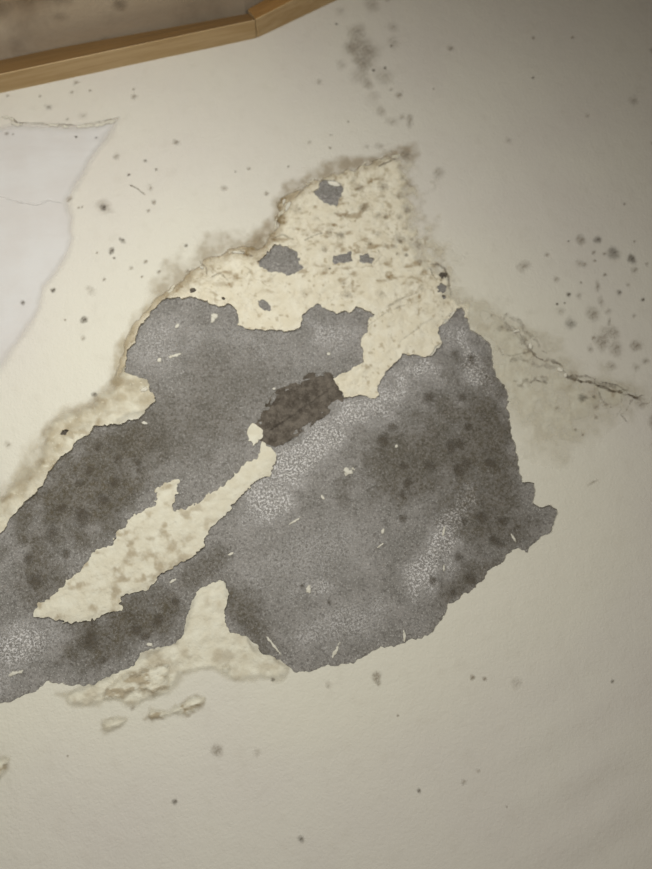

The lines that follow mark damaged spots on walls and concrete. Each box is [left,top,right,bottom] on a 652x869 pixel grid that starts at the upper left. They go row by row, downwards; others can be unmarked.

spalling [0,154,630,706]
crack [513,329,639,399]